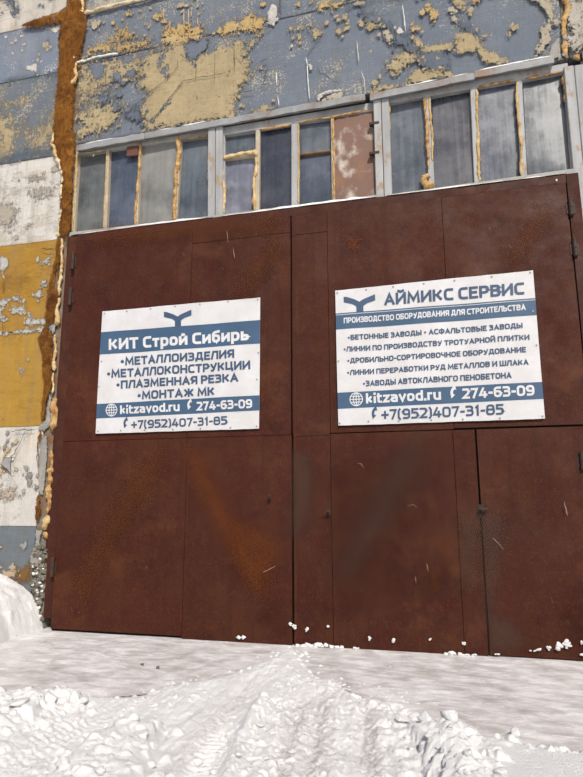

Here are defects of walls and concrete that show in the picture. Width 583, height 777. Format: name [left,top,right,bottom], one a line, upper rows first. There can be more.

peeling [1,0,20,21]
peeling [26,24,61,76]
peeling [73,1,279,144]
peeling [317,88,343,101]
peeling [286,0,512,94]
spalling [531,0,583,58]
peeling [0,93,55,165]
peeling [12,166,59,204]
peeling [0,196,32,240]
peeling [0,256,9,279]
spalling [0,394,52,503]
spalling [20,530,42,565]